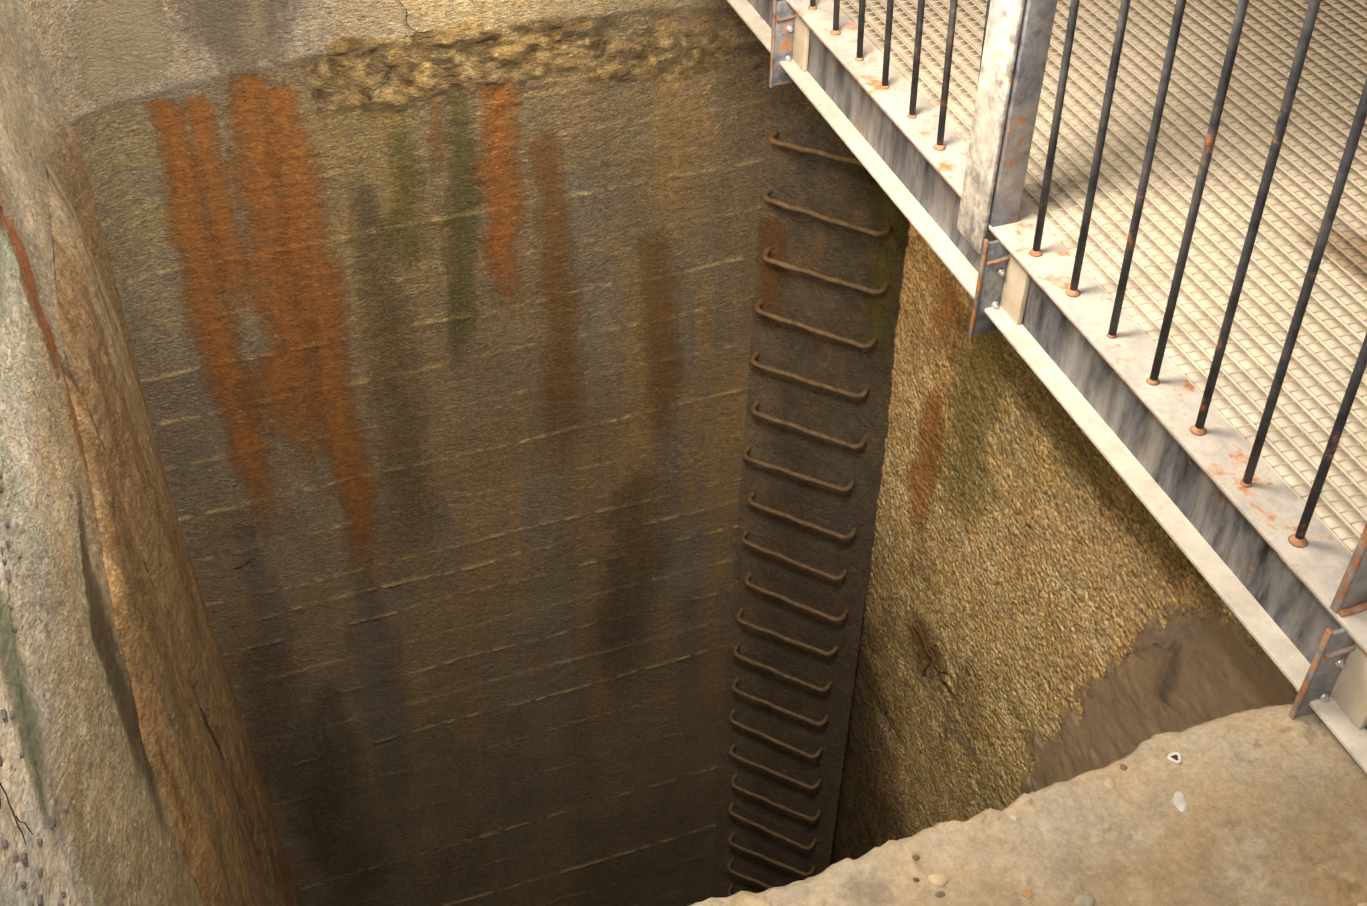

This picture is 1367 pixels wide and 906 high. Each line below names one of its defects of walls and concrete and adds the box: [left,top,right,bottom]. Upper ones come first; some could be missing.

spalling [308,17,741,120]
rust [477,84,522,293]
rust [910,393,944,522]
crack [0,782,33,845]